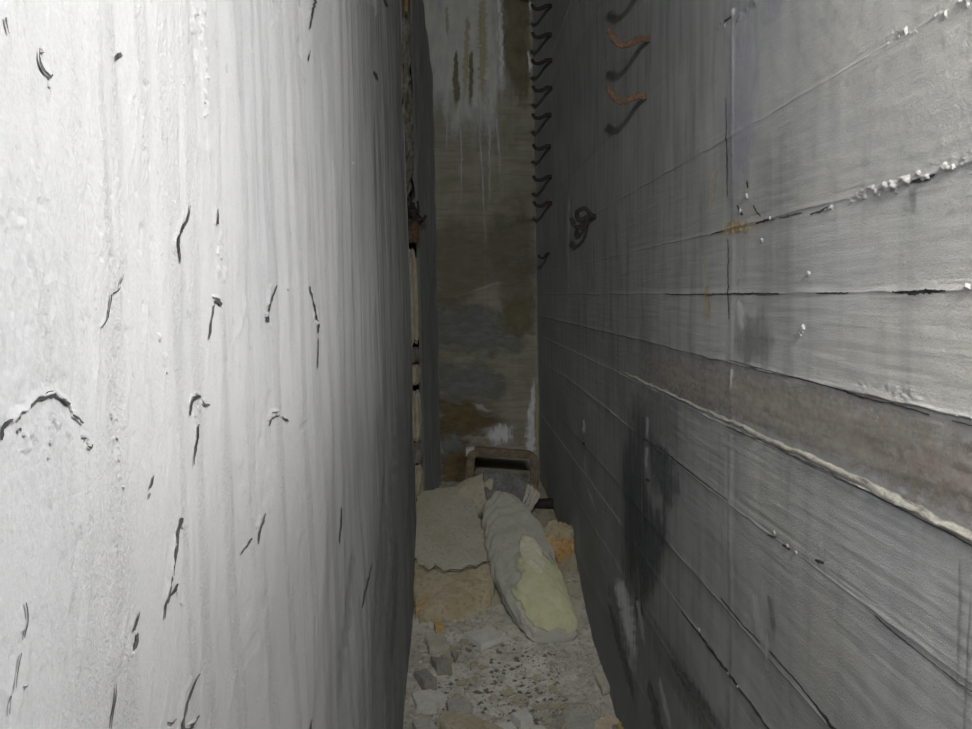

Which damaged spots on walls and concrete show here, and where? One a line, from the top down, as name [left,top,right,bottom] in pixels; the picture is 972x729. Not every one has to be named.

water stain [453,3,485,102]
water stain [502,0,532,97]
crack [722,98,730,196]
crack [669,239,779,319]
crack [892,283,971,295]
spalling [0,384,93,464]
water stain [639,352,972,511]
water stain [609,417,679,691]